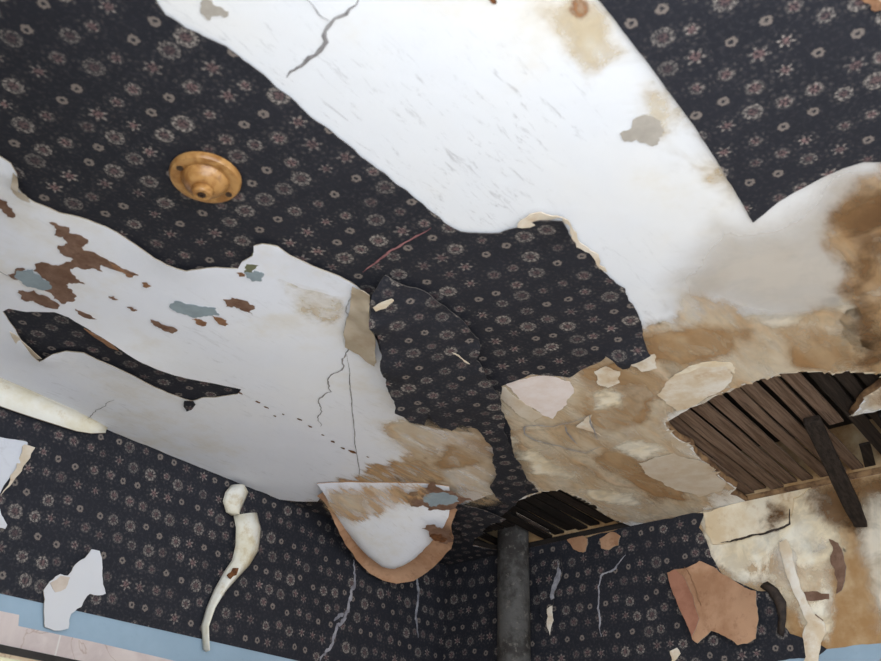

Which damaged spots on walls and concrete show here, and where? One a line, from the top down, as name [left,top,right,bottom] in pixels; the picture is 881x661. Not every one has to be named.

crack [287,0,359,77]
peeling [620,115,664,146]
peeling [9,222,151,319]
peeling [169,298,255,326]
crack [317,298,360,480]
peeling [501,376,574,422]
water stain [501,176,881,639]
peeling [657,361,735,411]
peeling [397,482,473,511]
peeling [703,487,811,545]
peeling [201,484,261,652]
flaking render [804,539,846,601]